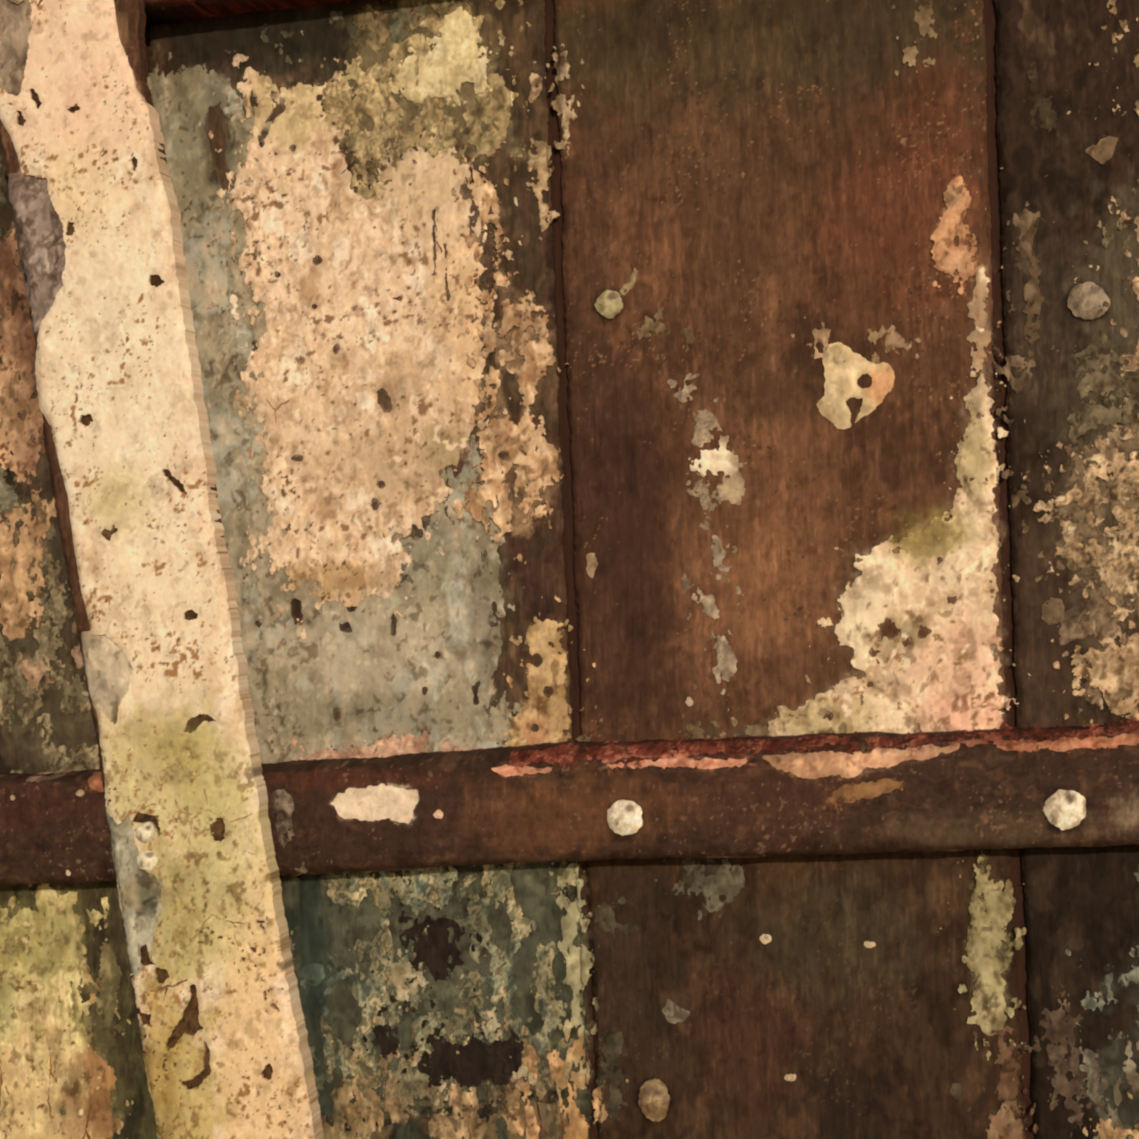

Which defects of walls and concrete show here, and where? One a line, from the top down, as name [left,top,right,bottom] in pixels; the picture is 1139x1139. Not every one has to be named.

peeling [0,0,42,109]
peeling [147,0,1139,811]
peeling [0,156,169,1139]
peeling [273,789,295,848]
peeling [289,861,639,1139]
peeling [950,849,1139,1139]